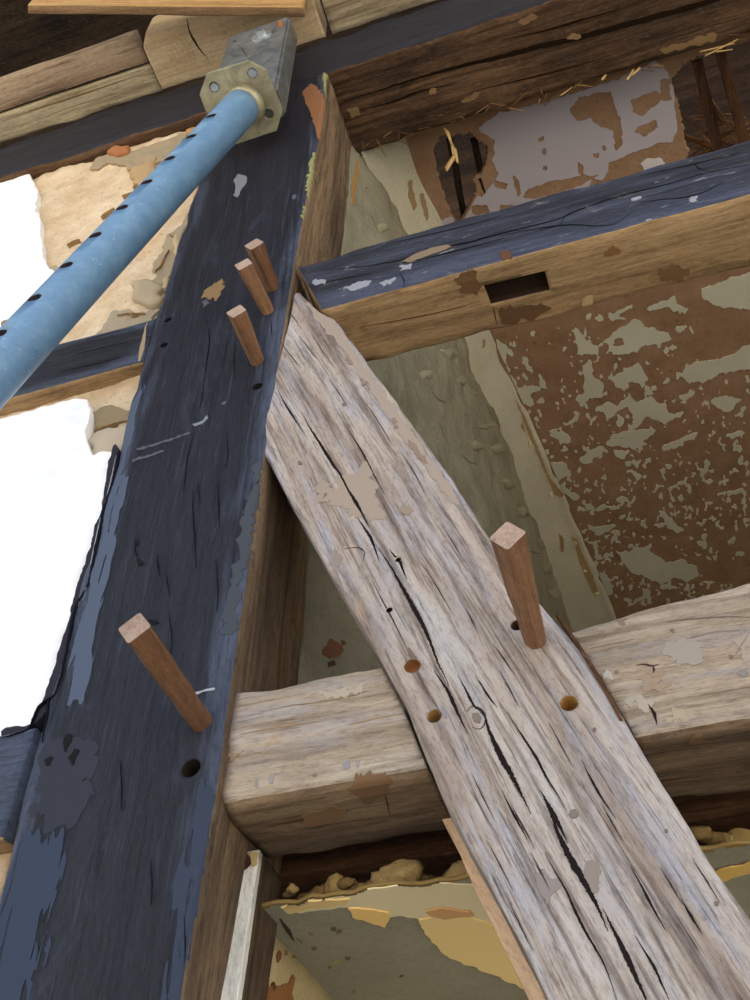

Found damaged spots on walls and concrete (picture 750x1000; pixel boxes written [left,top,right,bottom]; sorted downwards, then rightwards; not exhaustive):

crack [187,21,208,59]
peeling [441,60,678,225]
peeling [408,180,429,221]
peeling [515,400,564,498]
spalling [220,461,264,635]
peeling [559,534,599,596]
crack [276,387,669,1000]
hole [63,734,80,766]
crack [630,866,702,933]
peeling [267,974,295,1000]